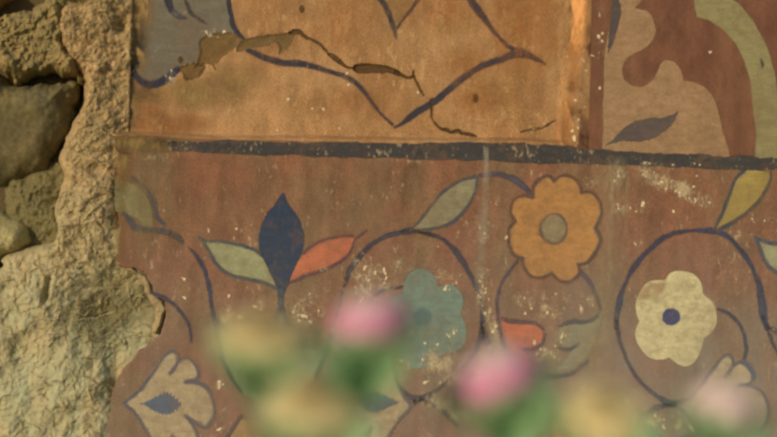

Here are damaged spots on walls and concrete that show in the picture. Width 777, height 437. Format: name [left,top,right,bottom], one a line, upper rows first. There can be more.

flaking render [166,30,295,80]
crack [288,29,352,69]
crack [397,70,477,137]
crack [520,120,555,133]
flaking render [122,267,166,334]